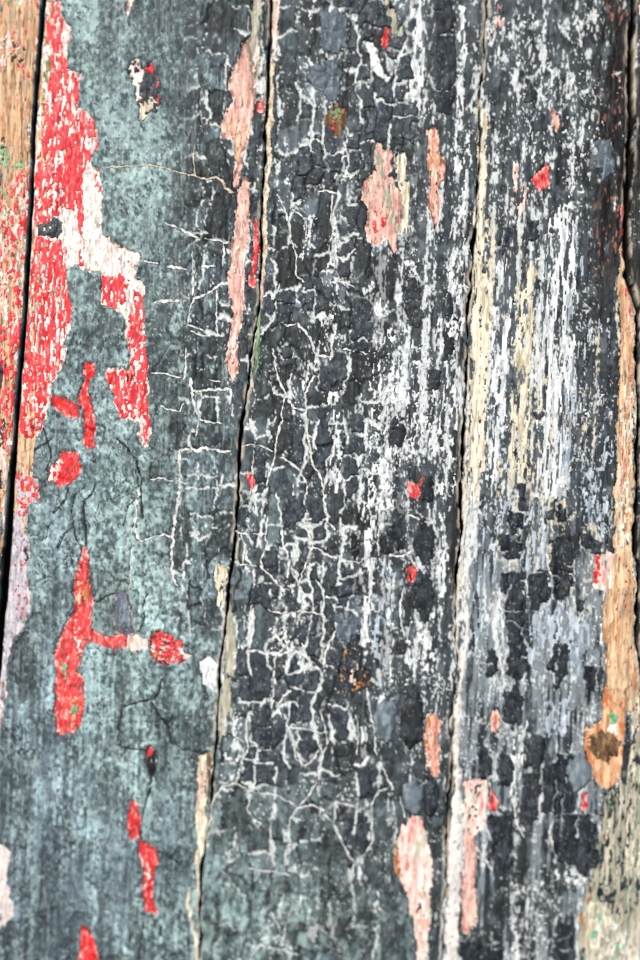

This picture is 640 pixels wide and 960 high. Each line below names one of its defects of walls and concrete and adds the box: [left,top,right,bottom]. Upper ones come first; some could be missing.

crack [105,149,234,193]
crack [318,151,358,287]
peeling [0,0,152,729]
crack [93,194,417,884]
peeling [200,0,640,960]
crack [499,524,551,603]
peeling [54,547,191,736]
crack [496,591,505,673]
crack [489,720,556,855]
peeling [0,844,14,928]
peeling [127,800,159,916]
peeling [185,753,211,960]